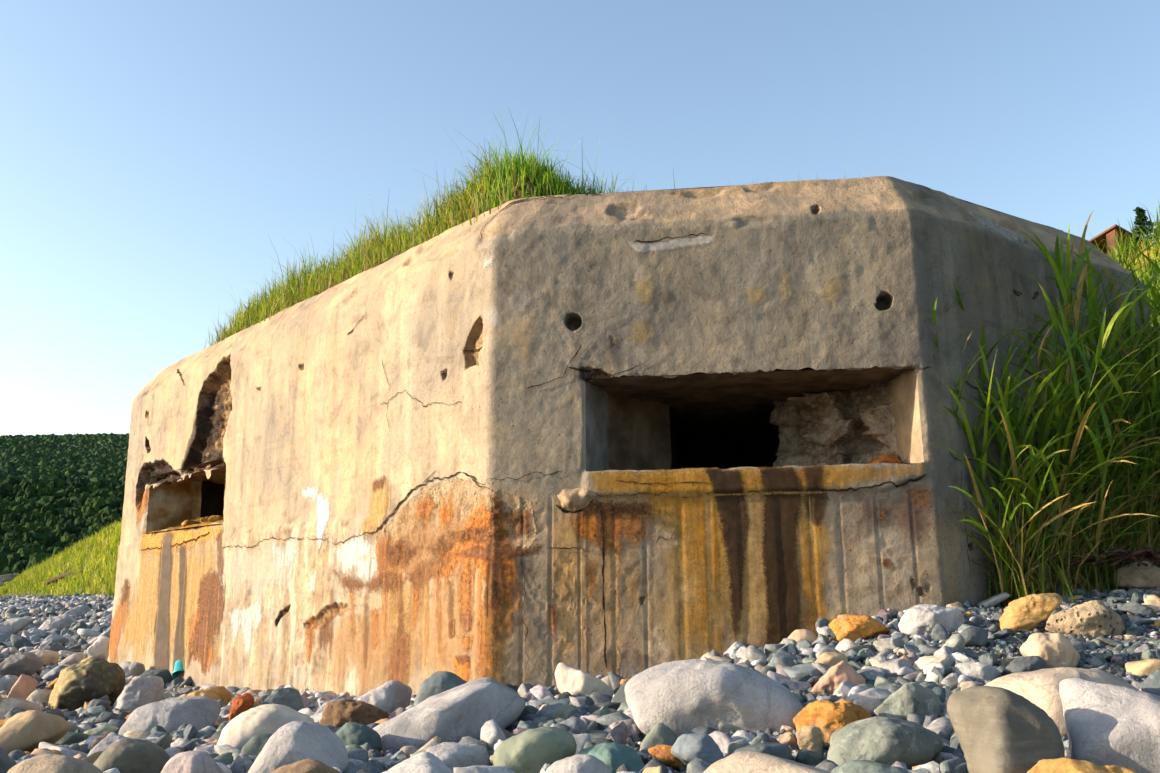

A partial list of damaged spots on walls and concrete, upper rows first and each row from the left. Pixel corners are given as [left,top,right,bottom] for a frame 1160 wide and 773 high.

spalling [462,315,483,369]
crack [528,343,644,388]
spalling [135,355,232,508]
corrosion [109,579,130,663]
corrosion [187,530,225,673]
crack [141,470,562,552]
corrosion [305,478,542,684]
corrosion [571,500,653,600]